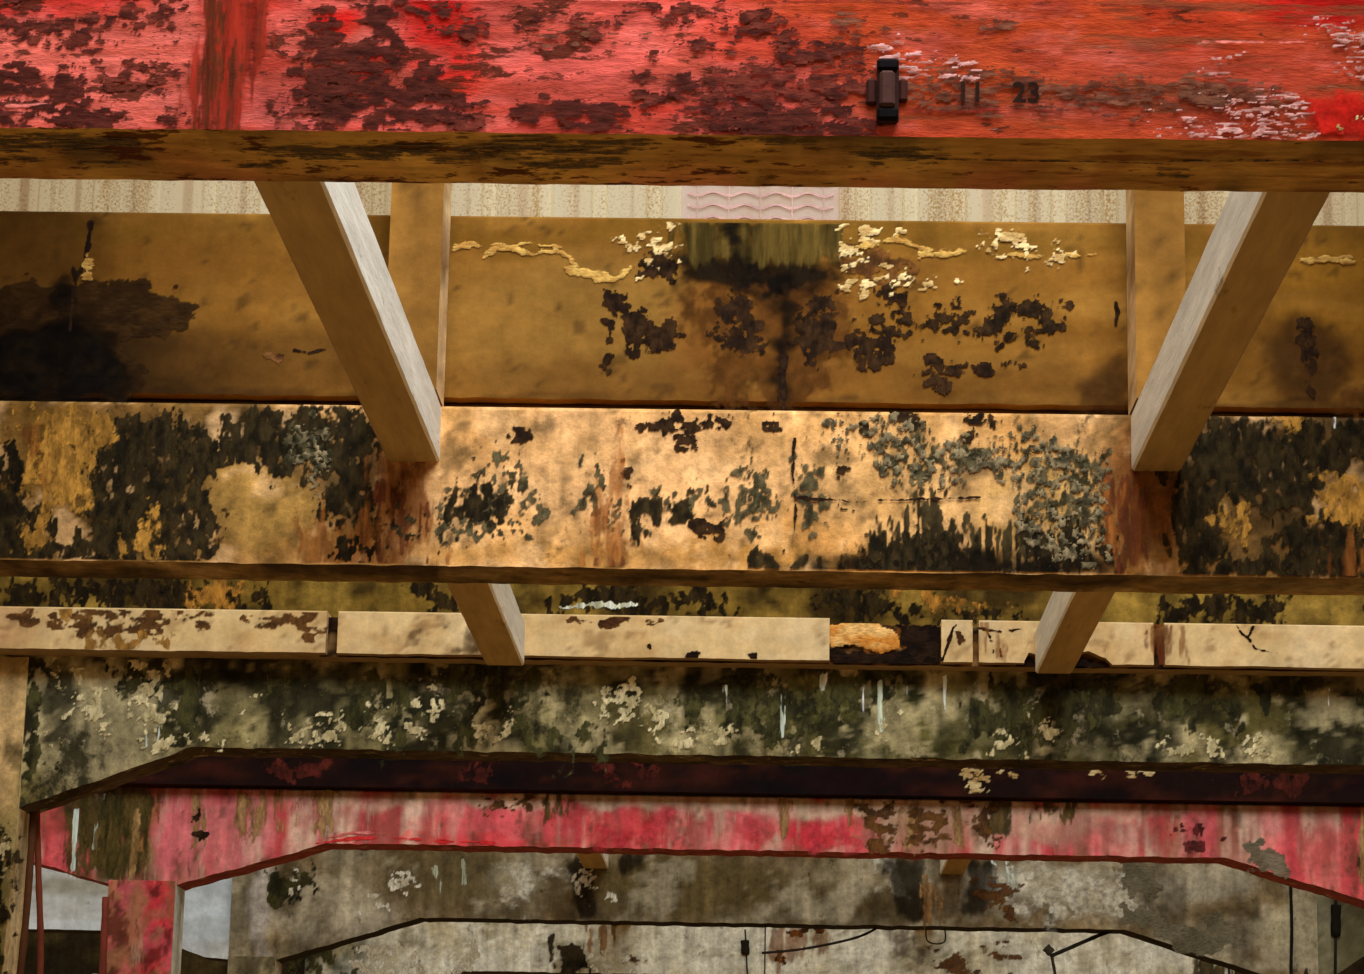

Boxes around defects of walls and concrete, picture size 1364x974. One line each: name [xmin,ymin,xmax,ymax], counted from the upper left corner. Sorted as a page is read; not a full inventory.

peeling [0,0,194,129]
peeling [264,0,1321,139]
peeling [1299,16,1364,81]
flaking render [452,241,632,283]
water stain [599,222,1094,410]
water stain [0,273,551,560]
water stain [841,484,1119,573]
water stain [0,577,328,755]
water stain [544,584,740,617]
spalling [829,623,966,664]
water stain [282,684,454,749]
water stain [592,676,738,752]